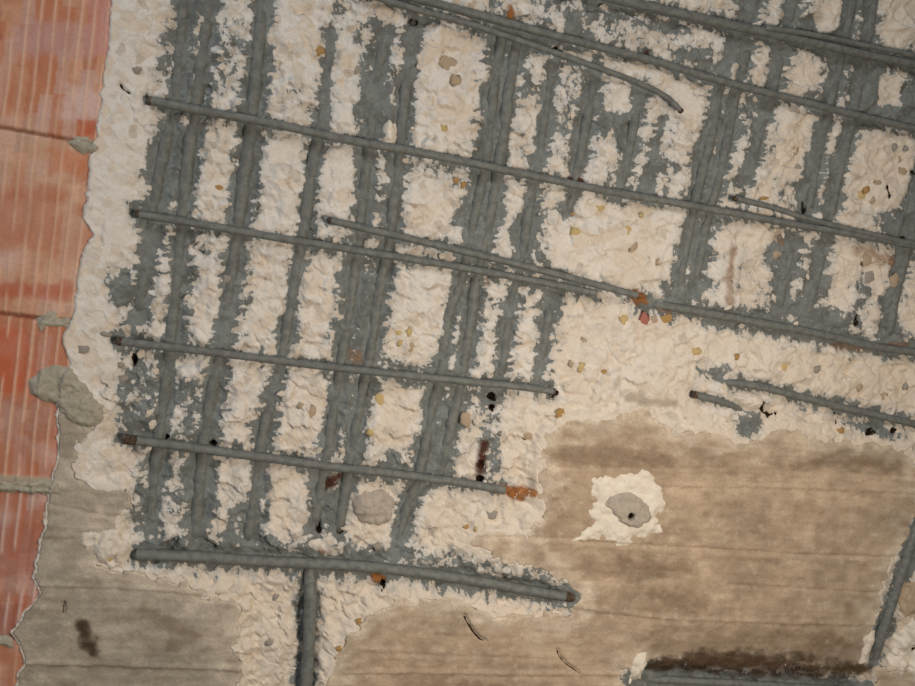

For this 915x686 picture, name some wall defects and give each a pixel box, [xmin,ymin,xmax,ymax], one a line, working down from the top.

spalling [115,0,915,474]
spalling [145,447,164,516]
spalling [191,453,208,540]
spalling [243,461,263,542]
spalling [121,434,506,494]
corrosion [495,485,538,501]
spalling [230,578,304,686]
spalling [300,569,317,686]
spalling [312,580,364,686]
spalling [135,549,576,602]
damp [646,649,871,678]
spalling [620,517,915,686]